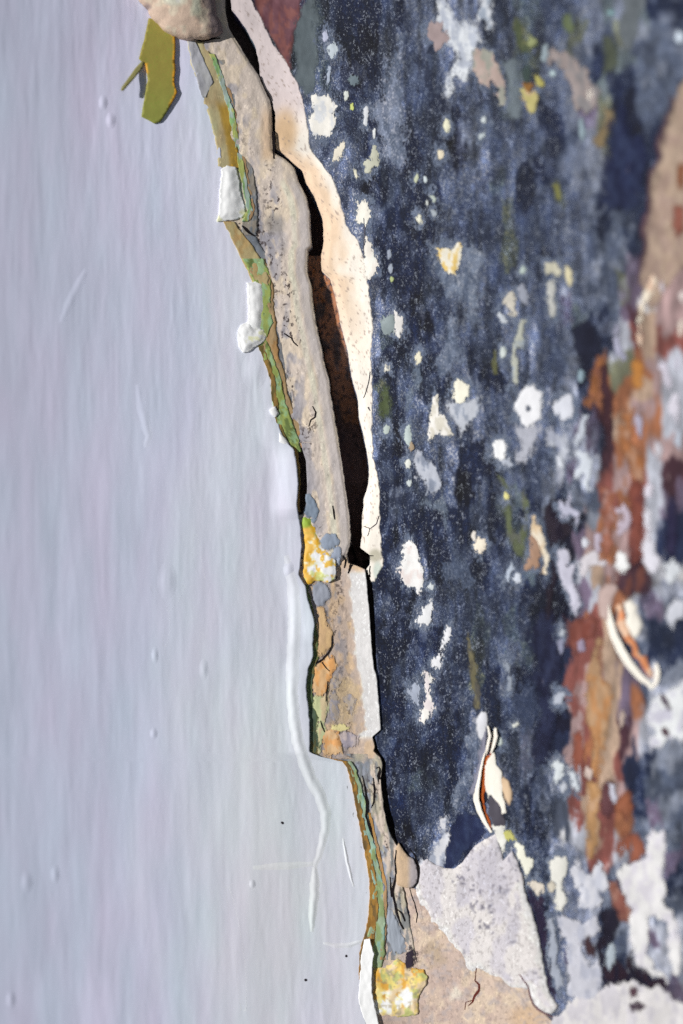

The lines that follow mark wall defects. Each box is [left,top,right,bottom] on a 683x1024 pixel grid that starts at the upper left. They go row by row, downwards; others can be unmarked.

peeling [121,18,177,124]
crack [284,175,379,669]
flaking render [187,0,683,1024]
corrosion [552,257,683,922]